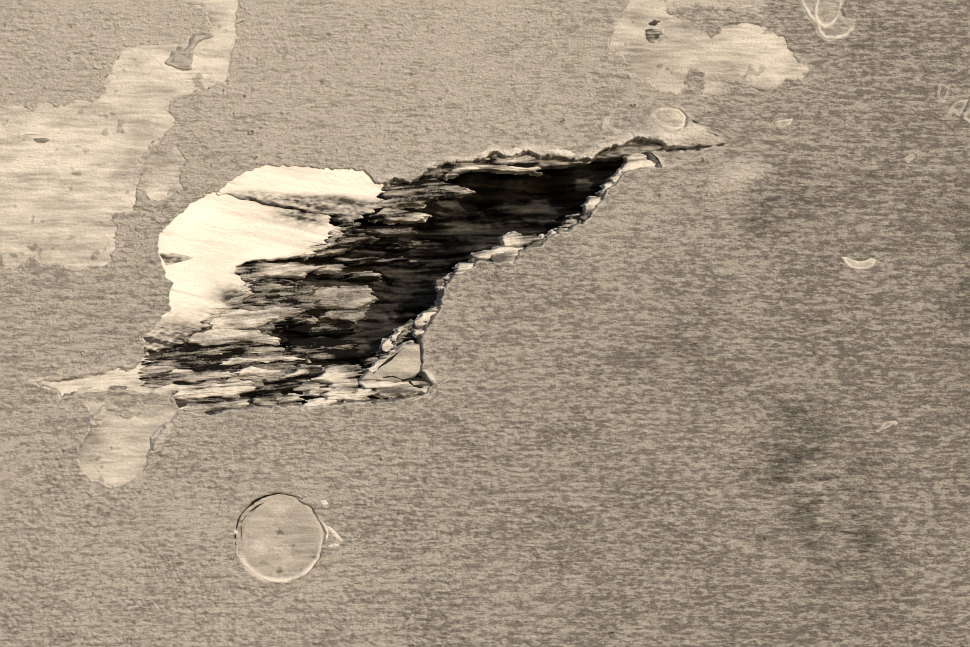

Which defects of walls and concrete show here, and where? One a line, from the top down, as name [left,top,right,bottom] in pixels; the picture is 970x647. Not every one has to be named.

peeling [609,0,814,95]
peeling [0,0,243,272]
spalling [236,107,686,404]
spalling [138,343,197,374]
peeling [69,386,190,486]